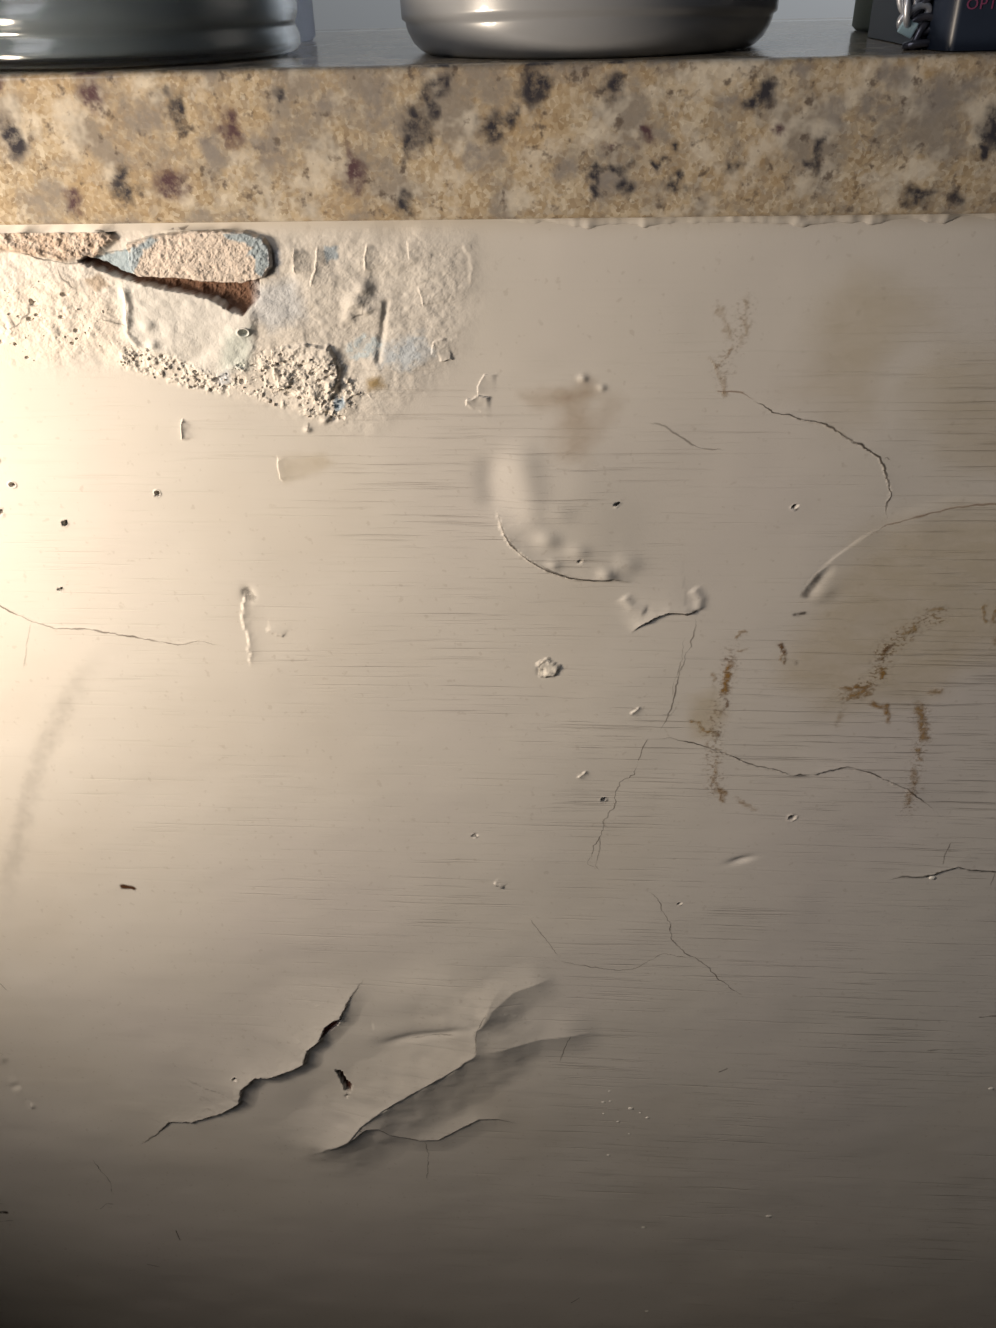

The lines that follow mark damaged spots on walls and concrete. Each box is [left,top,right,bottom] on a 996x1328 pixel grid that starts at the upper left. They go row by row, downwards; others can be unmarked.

spalling [0,227,479,437]
crack [764,406,892,503]
corrosion [847,608,943,720]
peeling [192,965,521,1160]